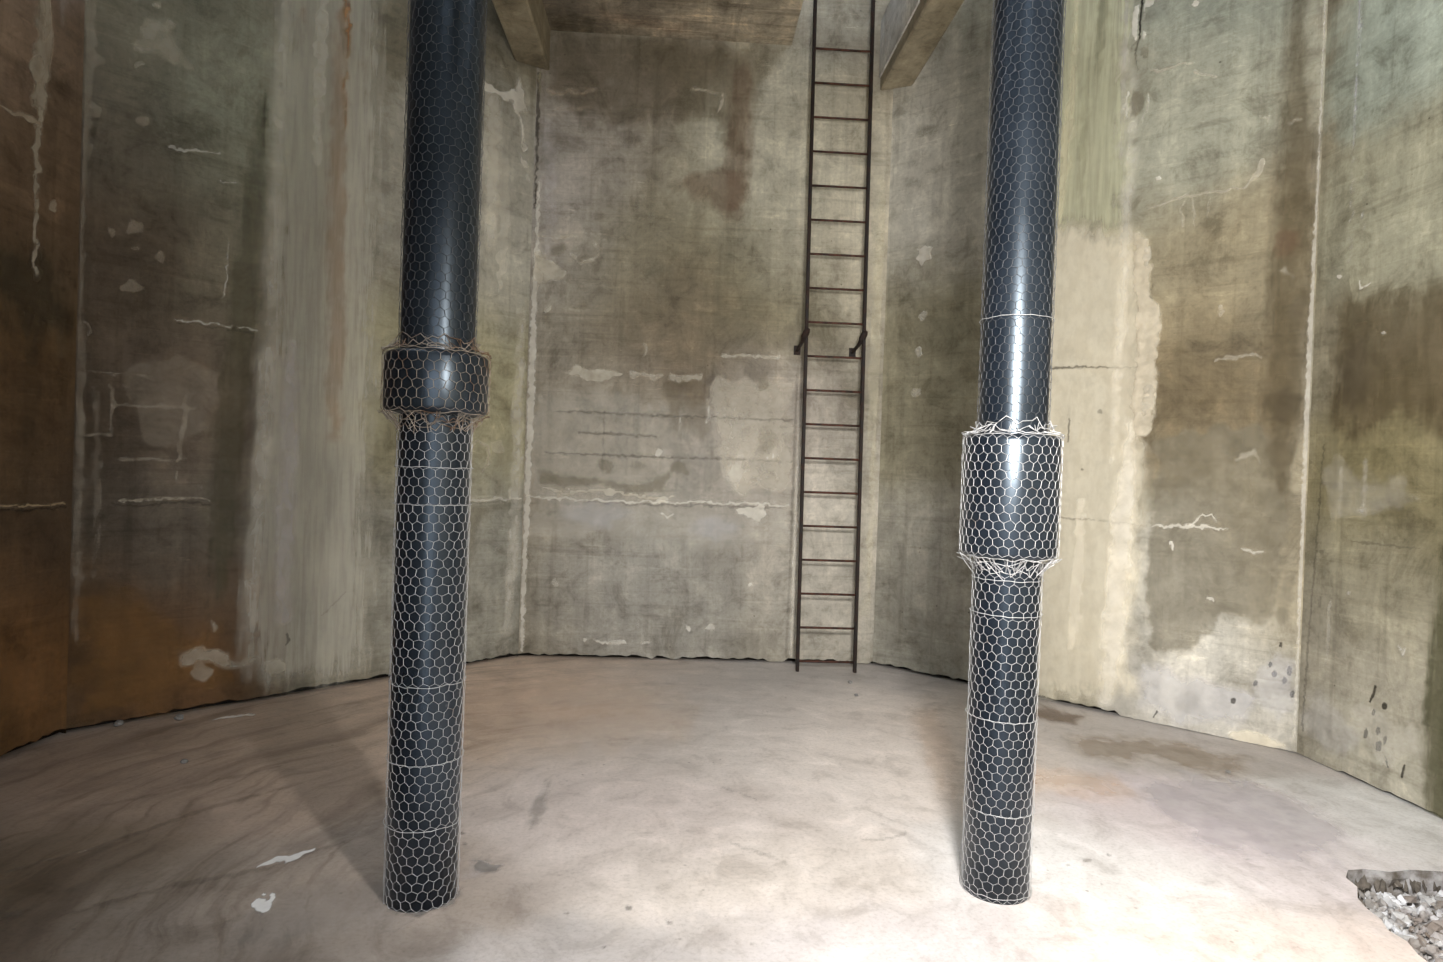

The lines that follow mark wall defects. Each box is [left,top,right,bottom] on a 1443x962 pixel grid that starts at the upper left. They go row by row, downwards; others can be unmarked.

leakage [0,0,72,329]
leakage [1333,288,1443,438]
crack [0,502,64,511]